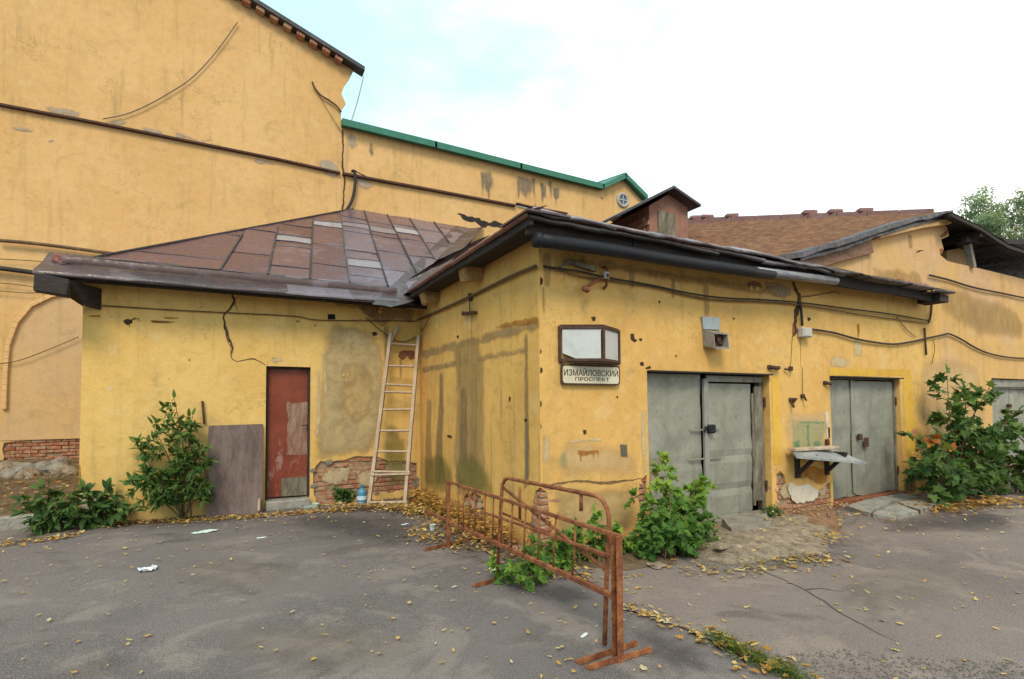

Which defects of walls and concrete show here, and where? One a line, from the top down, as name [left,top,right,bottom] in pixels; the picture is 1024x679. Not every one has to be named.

leakage [481,173,492,197]
leakage [517,177,559,199]
leakage [422,255,550,493]
flaking render [310,327,419,504]
flaking render [3,434,97,512]
flaking render [768,471,834,513]